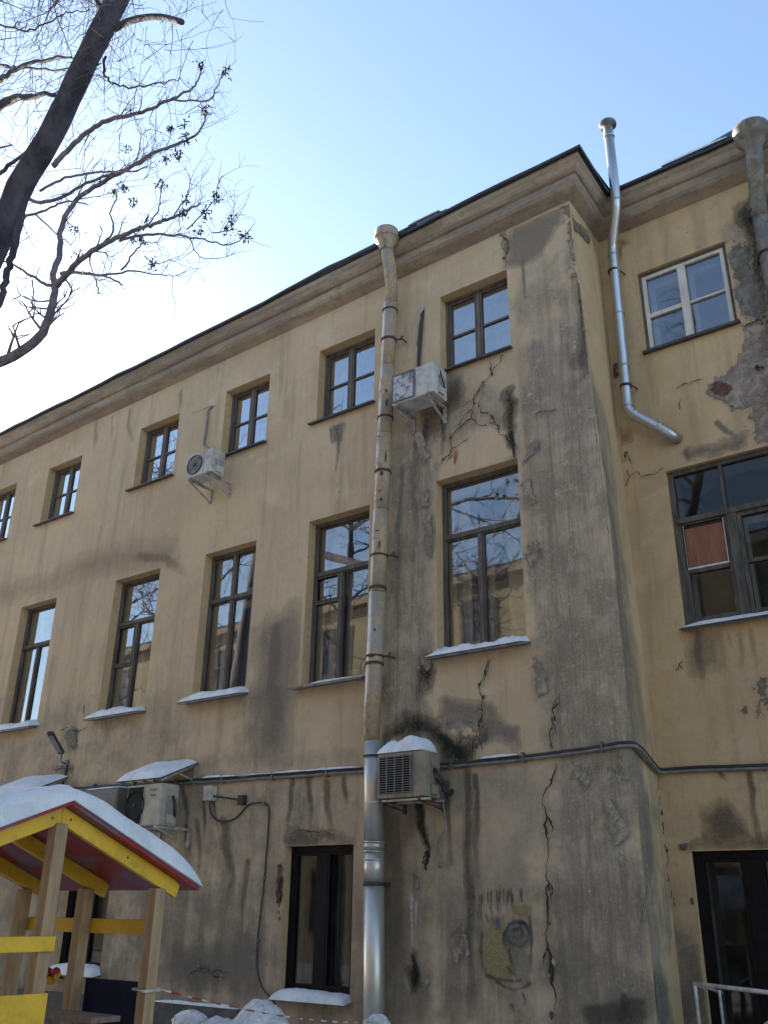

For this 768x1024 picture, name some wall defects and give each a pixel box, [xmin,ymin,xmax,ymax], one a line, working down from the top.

crack [436,354,516,473]
spalling [706,240,768,444]
leakage [385,800,427,988]
leakage [386,698,518,900]
crack [472,659,490,754]
crack [542,696,560,1021]